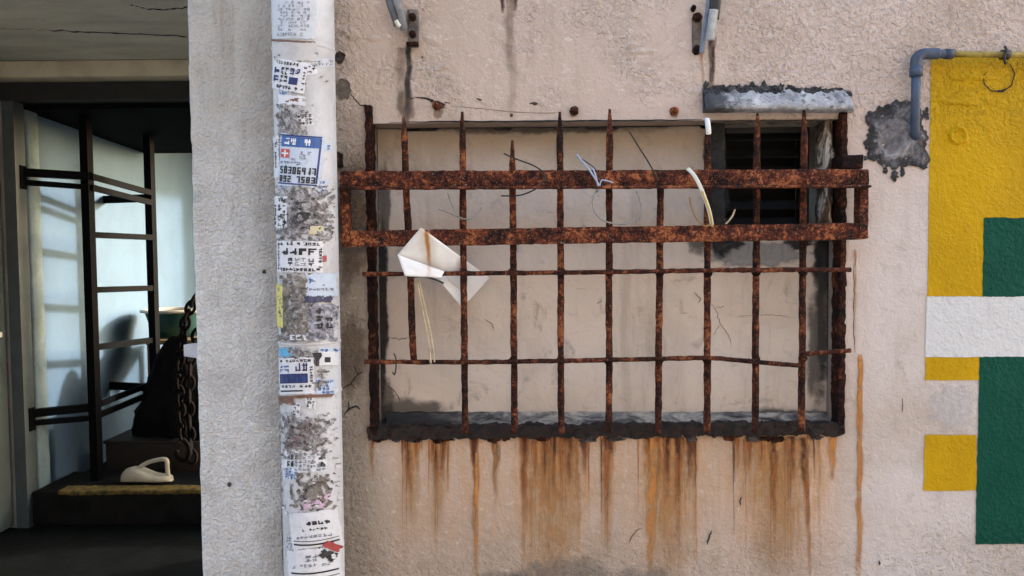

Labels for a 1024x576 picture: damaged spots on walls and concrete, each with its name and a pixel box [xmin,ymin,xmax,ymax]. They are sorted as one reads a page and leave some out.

damp [500,0,517,46]
damp [398,45,412,115]
corrosion [402,439,449,519]
corrosion [470,439,479,563]
corrosion [492,441,500,473]
corrosion [520,436,616,550]
corrosion [637,436,697,563]
corrosion [733,435,837,531]